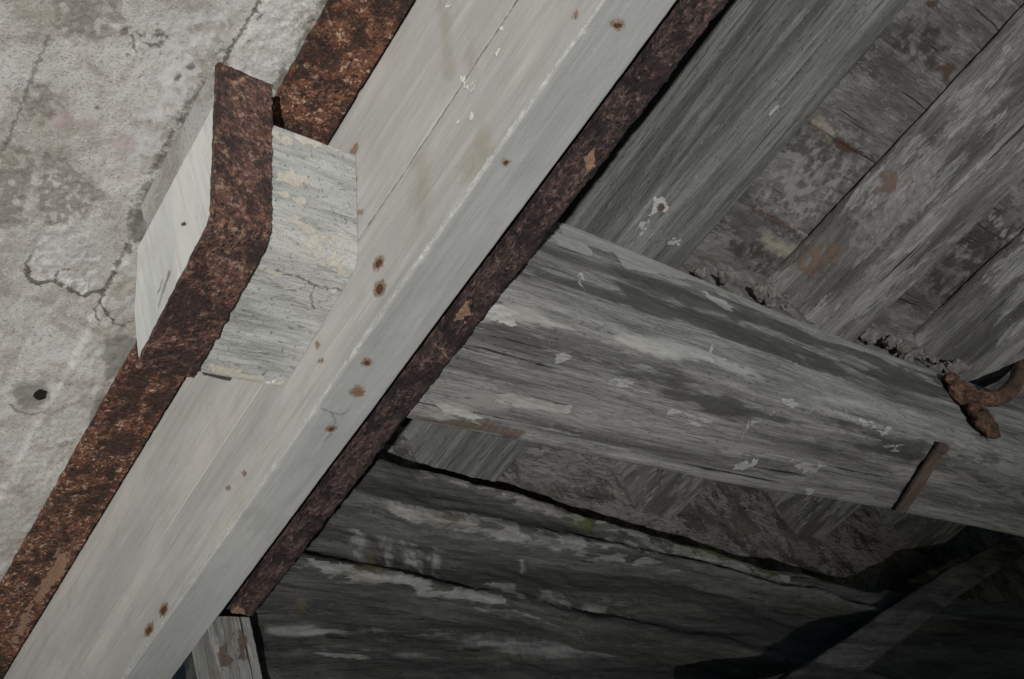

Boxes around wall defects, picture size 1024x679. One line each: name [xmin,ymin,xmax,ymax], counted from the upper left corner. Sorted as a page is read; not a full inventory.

rust [583,148,596,173]
rust [648,196,669,216]
crack [23,257,131,327]
rust [373,256,386,296]
rust [454,300,471,324]
peeling [537,223,969,461]
peeling [732,458,758,471]
rust [8,550,70,644]
rust [144,603,168,636]